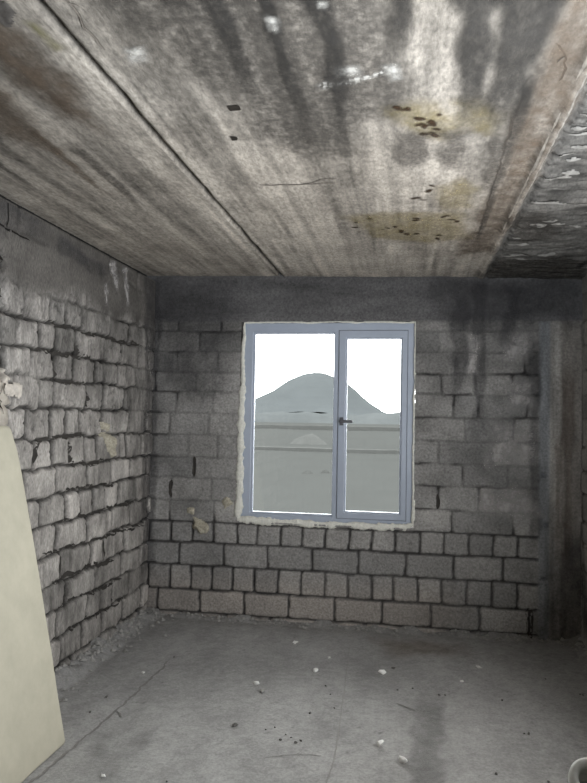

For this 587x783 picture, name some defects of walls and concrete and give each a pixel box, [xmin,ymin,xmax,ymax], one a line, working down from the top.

water stain [105,0,413,151]
water stain [452,0,587,254]
peeling [0,366,22,426]
water stain [468,338,478,372]